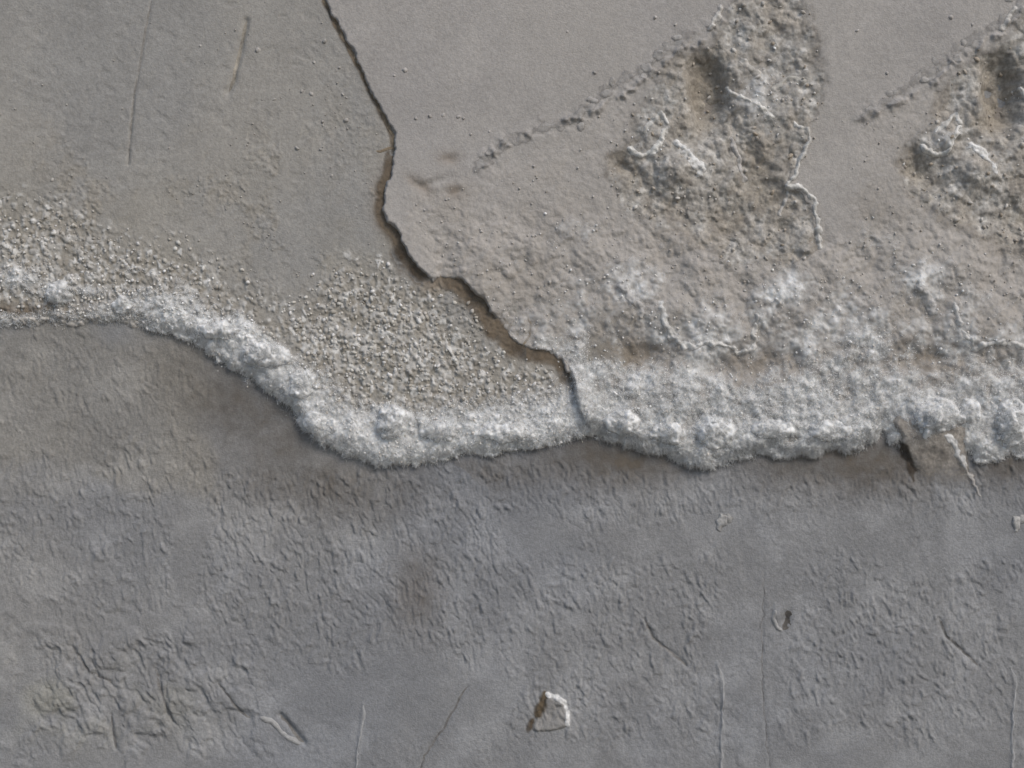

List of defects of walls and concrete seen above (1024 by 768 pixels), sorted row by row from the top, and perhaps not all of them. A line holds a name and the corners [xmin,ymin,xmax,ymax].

crack [322,0,574,402]
peeling [0,0,1024,497]
leakage [0,242,1024,478]
flaking render [527,691,570,732]